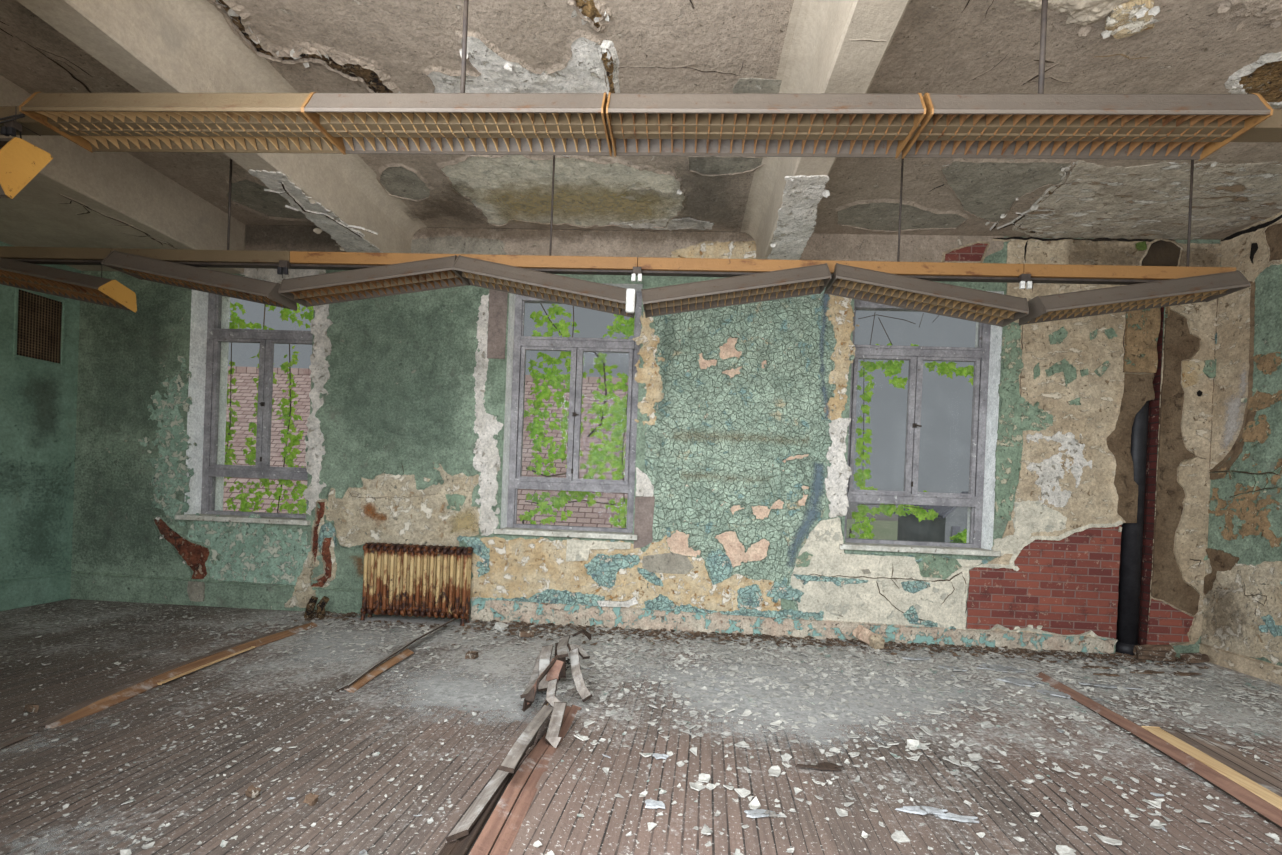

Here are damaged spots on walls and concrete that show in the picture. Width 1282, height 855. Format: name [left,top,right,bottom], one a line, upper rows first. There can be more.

crack [0,17,94,93]
spalling [207,0,403,93]
peeling [421,0,620,98]
crack [960,0,995,19]
crack [970,51,1073,86]
spalling [1101,0,1160,39]
water stain [491,188,661,219]
peeling [138,155,1282,665]
crack [642,287,967,620]